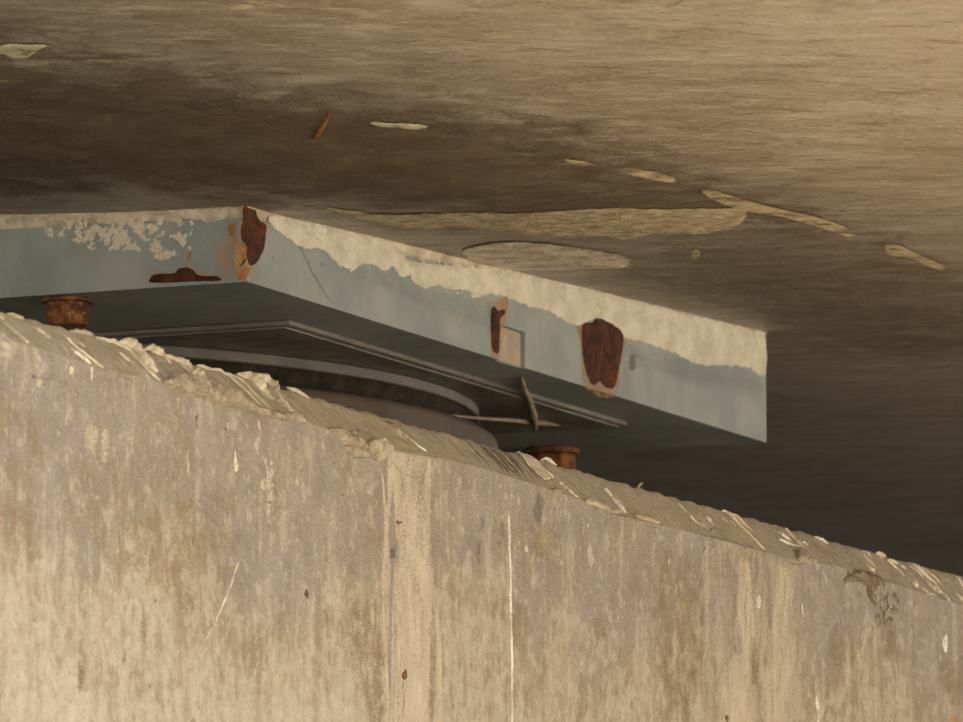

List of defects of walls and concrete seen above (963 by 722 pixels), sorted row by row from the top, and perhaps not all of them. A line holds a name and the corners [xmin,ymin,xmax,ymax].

peeling [0,207,231,261]
corrosion [139,206,269,283]
peeling [323,198,747,271]
corrosion [490,297,509,358]
corrosion [577,318,627,399]
water stain [0,313,313,619]
peeling [516,451,563,510]
water stain [338,412,454,722]
water stain [496,494,563,722]
water stain [650,503,828,722]
spalling [844,569,899,628]
water stain [828,550,963,721]